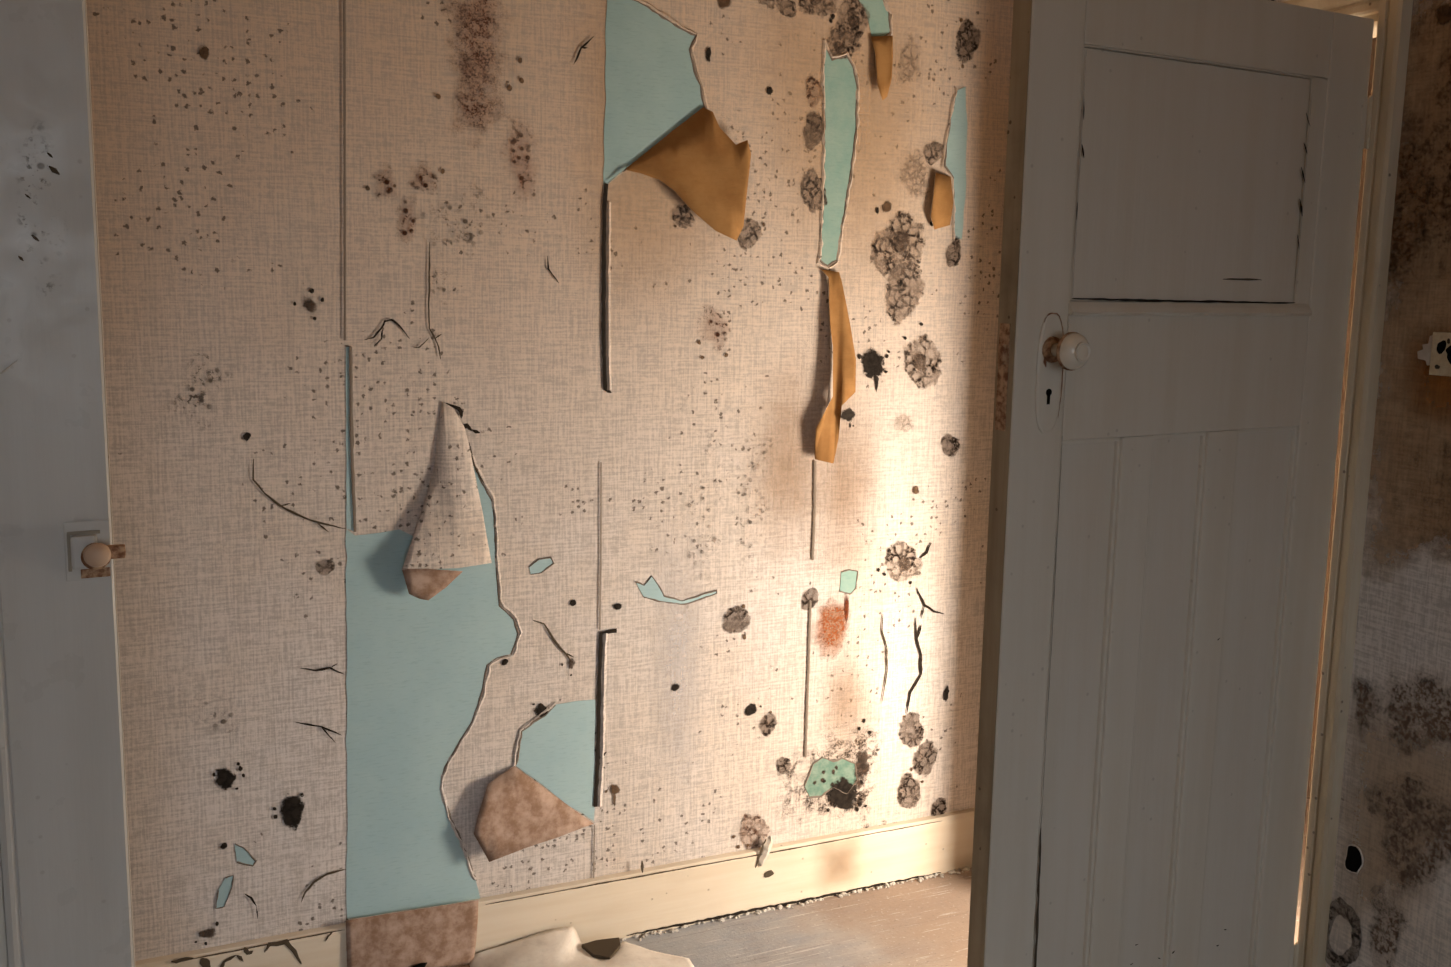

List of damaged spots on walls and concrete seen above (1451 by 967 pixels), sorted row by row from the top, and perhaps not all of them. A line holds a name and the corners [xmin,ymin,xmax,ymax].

leakage [811,0,860,29]
mould [435,0,524,130]
leakage [506,123,532,190]
leakage [894,231,910,253]
leakage [1370,0,1451,563]
leakage [913,354,926,371]
corrosion [1418,360,1451,412]
leakage [788,719,884,828]
leakage [1355,673,1451,967]